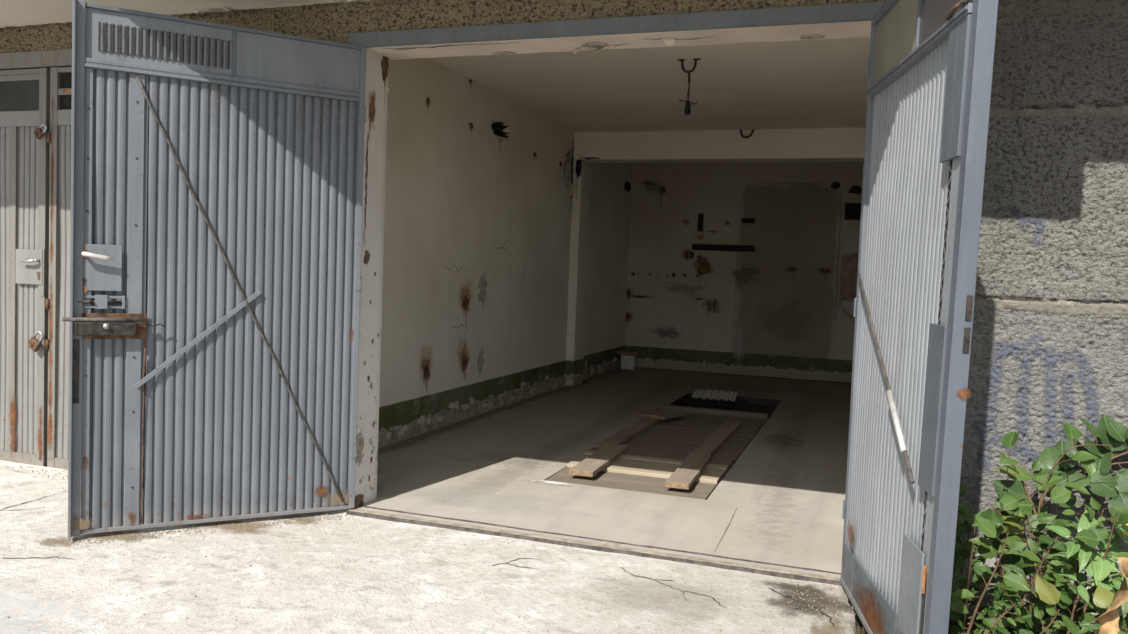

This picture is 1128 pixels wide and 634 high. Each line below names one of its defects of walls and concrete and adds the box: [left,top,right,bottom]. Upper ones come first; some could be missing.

corrosion [38,152,54,460]
spalling [669,393,782,418]
peeling [354,354,621,508]
crack [621,567,725,607]
corrosion [860,591,883,634]